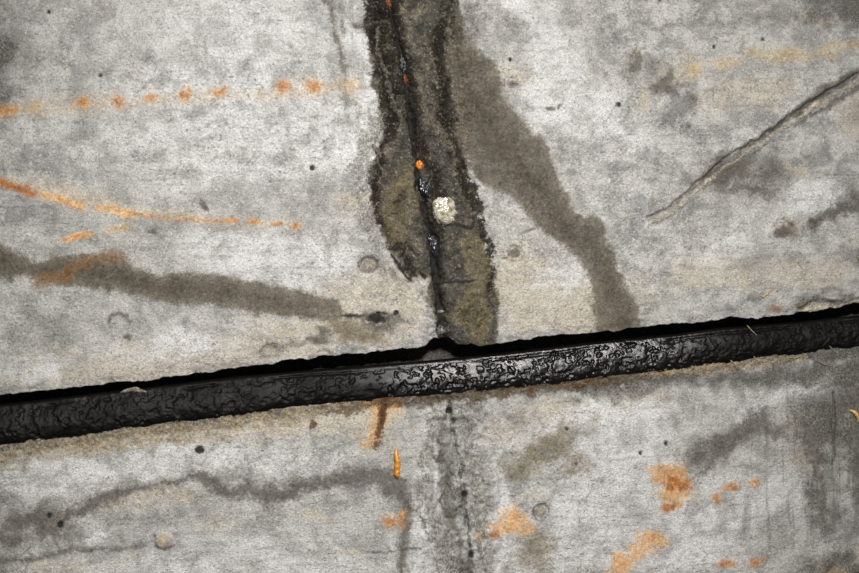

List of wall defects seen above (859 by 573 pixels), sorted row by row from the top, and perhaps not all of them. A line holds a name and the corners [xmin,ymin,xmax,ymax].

corrosion [0,178,84,208]
crack [354,2,476,339]
damp [345,0,641,346]
crack [650,68,859,223]
damp [0,245,351,321]
crack [342,310,379,318]
damp [309,335,337,358]
corrosion [364,397,397,450]
corrosion [652,465,692,512]
corrosion [613,532,665,573]